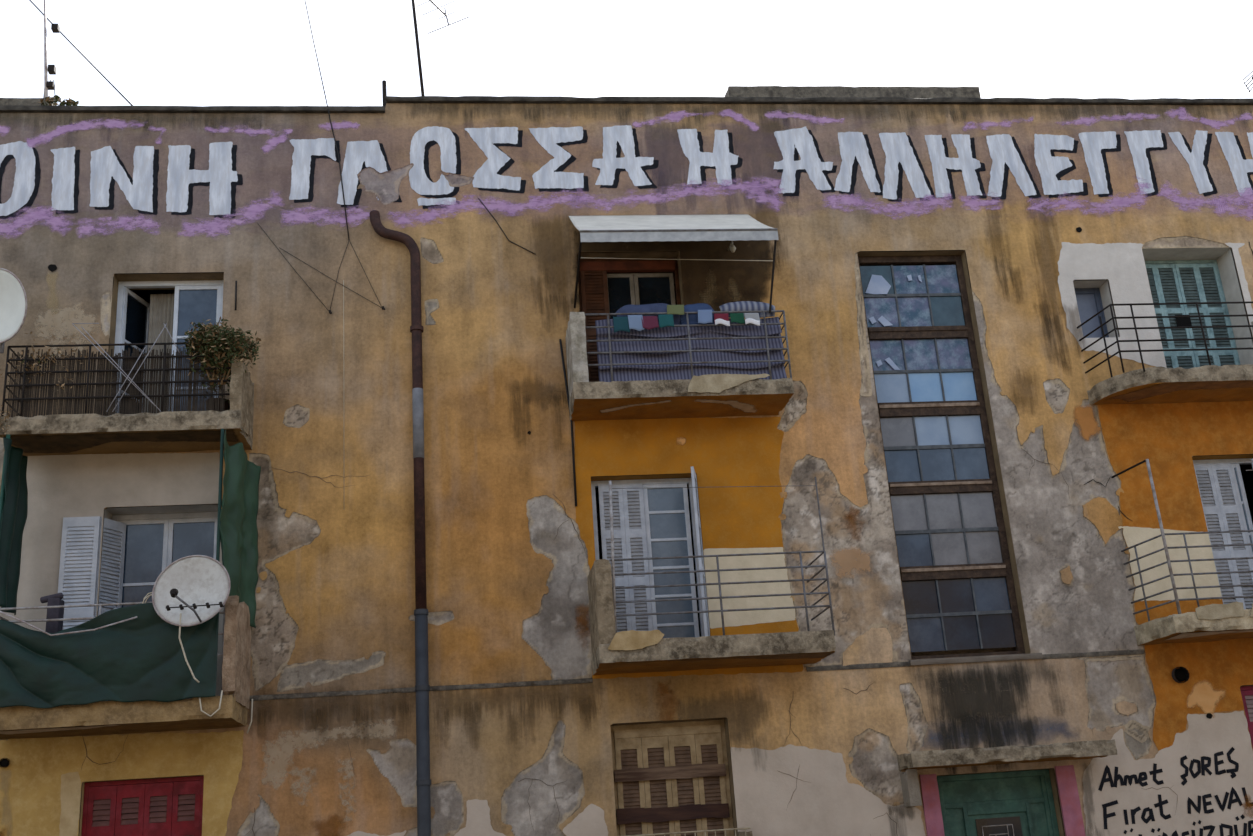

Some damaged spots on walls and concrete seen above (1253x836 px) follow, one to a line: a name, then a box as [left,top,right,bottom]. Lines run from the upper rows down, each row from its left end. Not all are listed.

spalling [651,253,917,667]
spalling [521,495,592,680]
peeling [608,630,664,664]